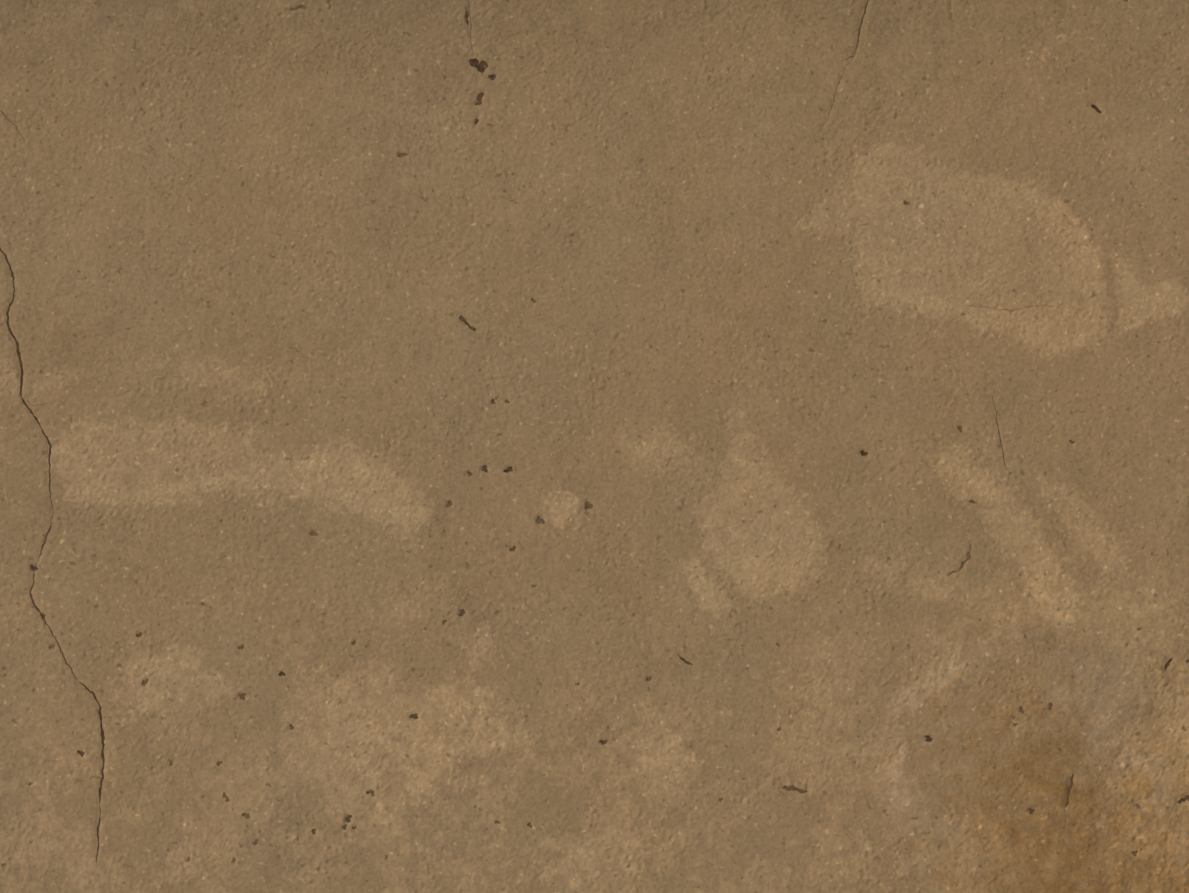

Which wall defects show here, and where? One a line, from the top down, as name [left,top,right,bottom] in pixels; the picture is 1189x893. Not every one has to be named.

crack [0,248,105,862]
peeling [911,426,1189,677]